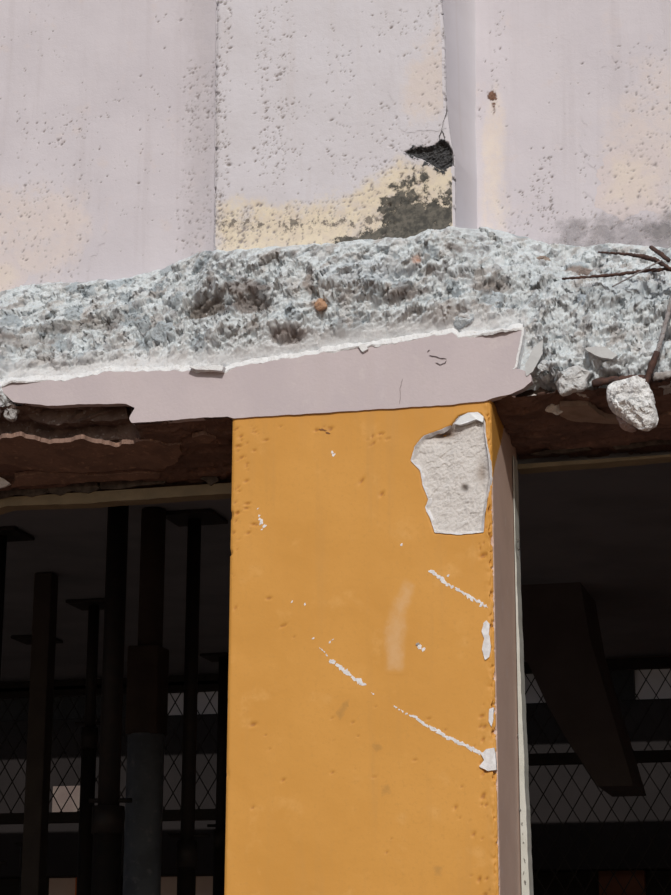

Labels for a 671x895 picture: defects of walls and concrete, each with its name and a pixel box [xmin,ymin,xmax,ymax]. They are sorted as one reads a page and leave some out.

corrosion [475,75,520,236]
damp [222,167,452,244]
spalling [0,0,671,499]
spalling [411,412,493,535]
peeling [428,570,488,608]
peeling [312,637,374,695]
peeling [482,620,491,660]
spalling [394,706,497,771]